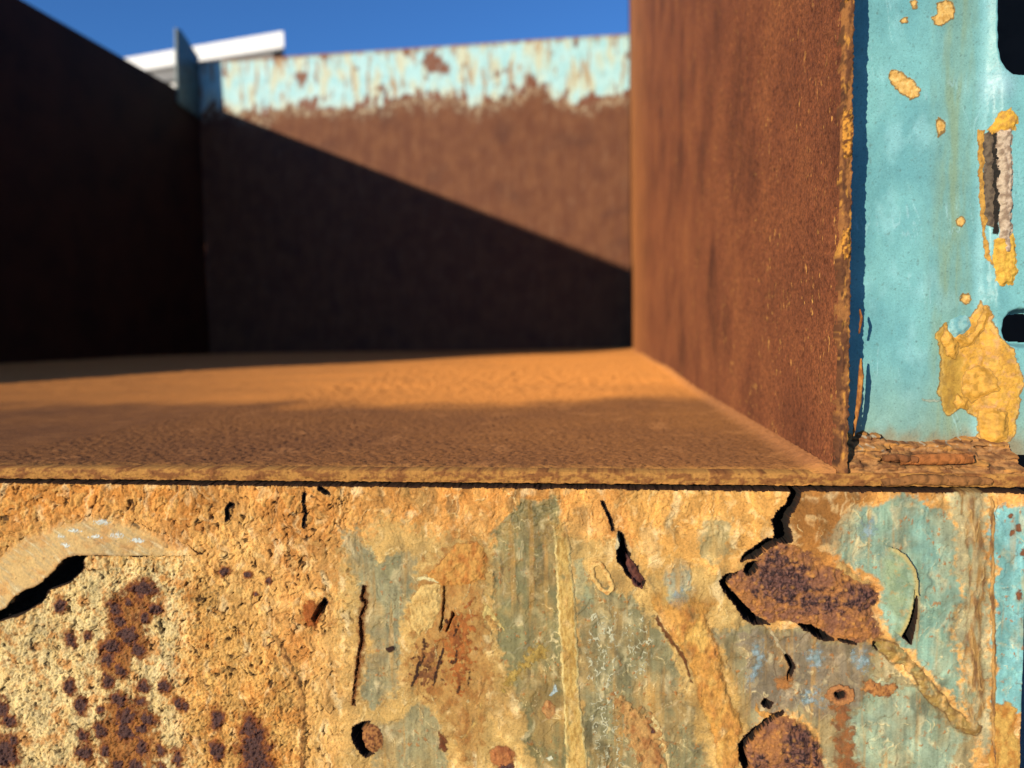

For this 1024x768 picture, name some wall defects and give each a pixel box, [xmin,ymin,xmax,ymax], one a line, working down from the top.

peeling [931,0,955,26]
peeling [888,69,921,100]
corrosion [842,108,854,158]
corrosion [841,227,852,260]
peeling [935,293,1024,443]
corrosion [53,598,68,614]
peeling [0,514,197,622]
corrosion [217,566,253,579]
crack [0,478,1024,706]
corrosion [62,577,189,768]
corrosion [208,704,278,768]